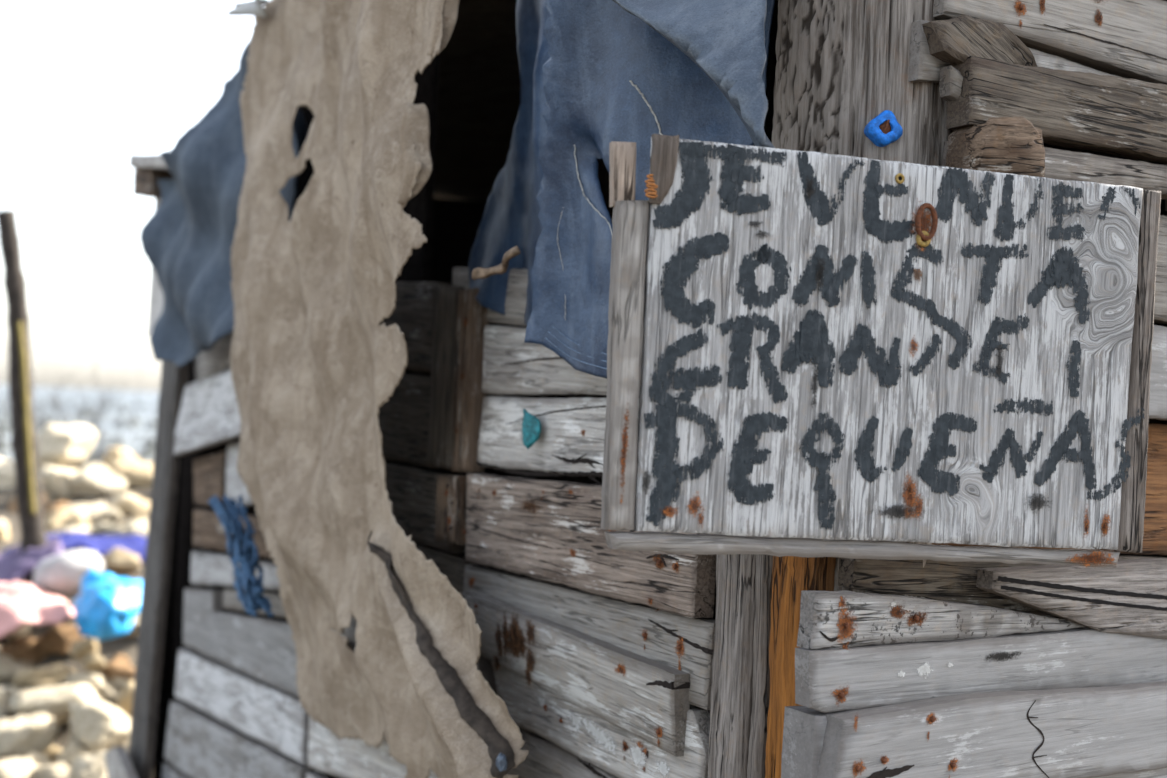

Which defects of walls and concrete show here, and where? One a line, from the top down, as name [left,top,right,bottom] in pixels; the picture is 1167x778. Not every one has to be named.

corrosion [836,596,856,649]
crack [1027,700,1049,778]